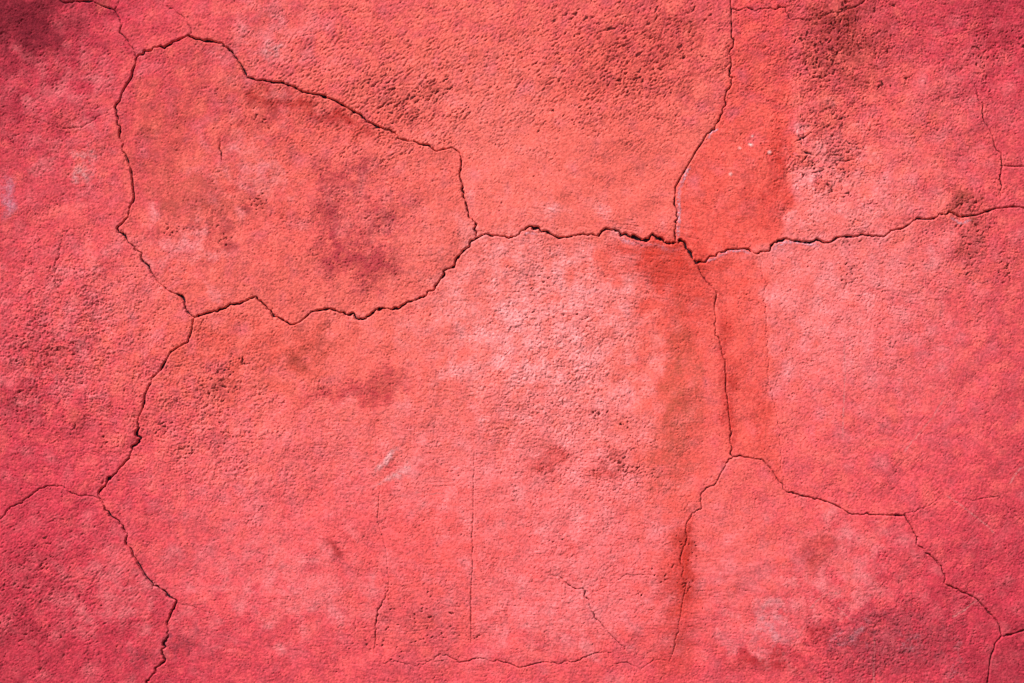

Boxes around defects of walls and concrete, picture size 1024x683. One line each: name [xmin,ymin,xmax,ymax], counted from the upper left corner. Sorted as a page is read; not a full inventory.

crack [60,0,881,320]
crack [898,206,1024,230]
crack [977,96,1023,190]
crack [94,155,295,683]
crack [677,326,1024,683]